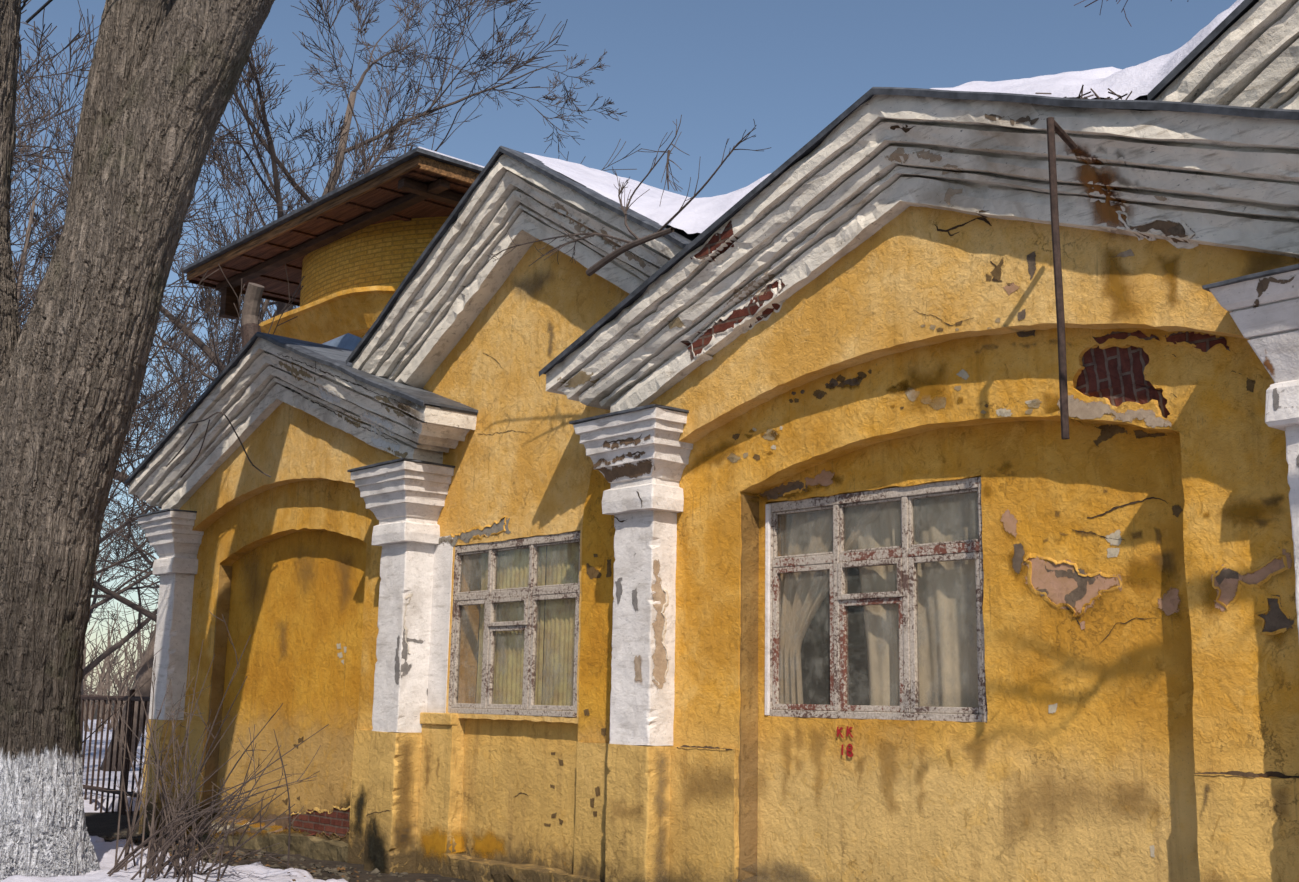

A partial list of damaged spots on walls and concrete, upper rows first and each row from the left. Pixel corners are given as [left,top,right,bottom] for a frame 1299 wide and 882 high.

corrosion [1071,147,1129,234]
flaking render [690,220,739,266]
flaking render [668,270,787,361]
flaking render [981,330,1230,447]
flaking render [593,434,655,482]
peeling [394,593,425,685]
peeling [586,554,669,689]
flaking render [1000,509,1161,630]
flaking render [1205,549,1296,641]
flaking render [186,796,350,840]
damp [399,747,503,857]
crack [1195,771,1299,779]